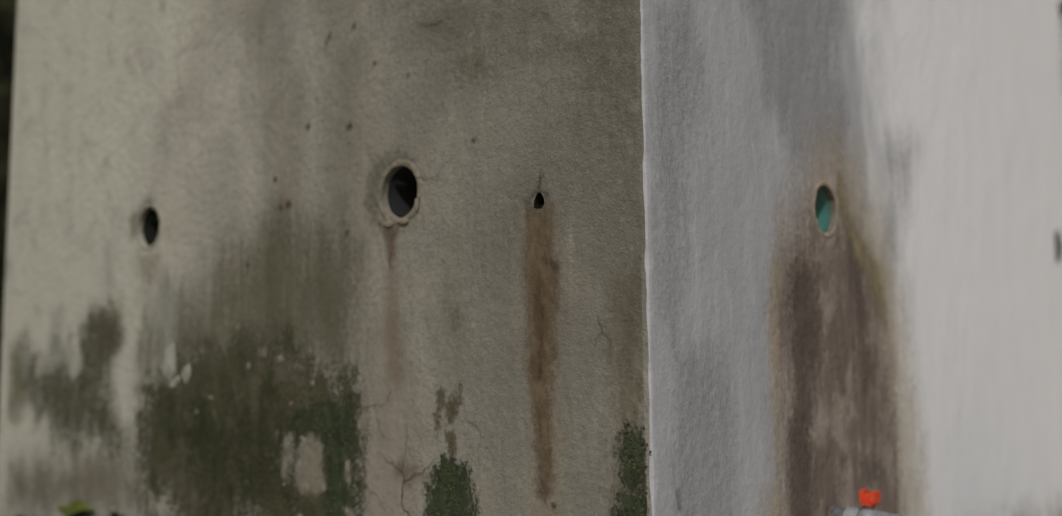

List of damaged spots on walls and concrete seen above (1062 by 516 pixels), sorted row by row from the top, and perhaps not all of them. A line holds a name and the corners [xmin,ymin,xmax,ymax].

crack [378,422,435,516]
mould [433,384,462,429]
rust [524,205,558,497]
water stain [773,144,923,516]